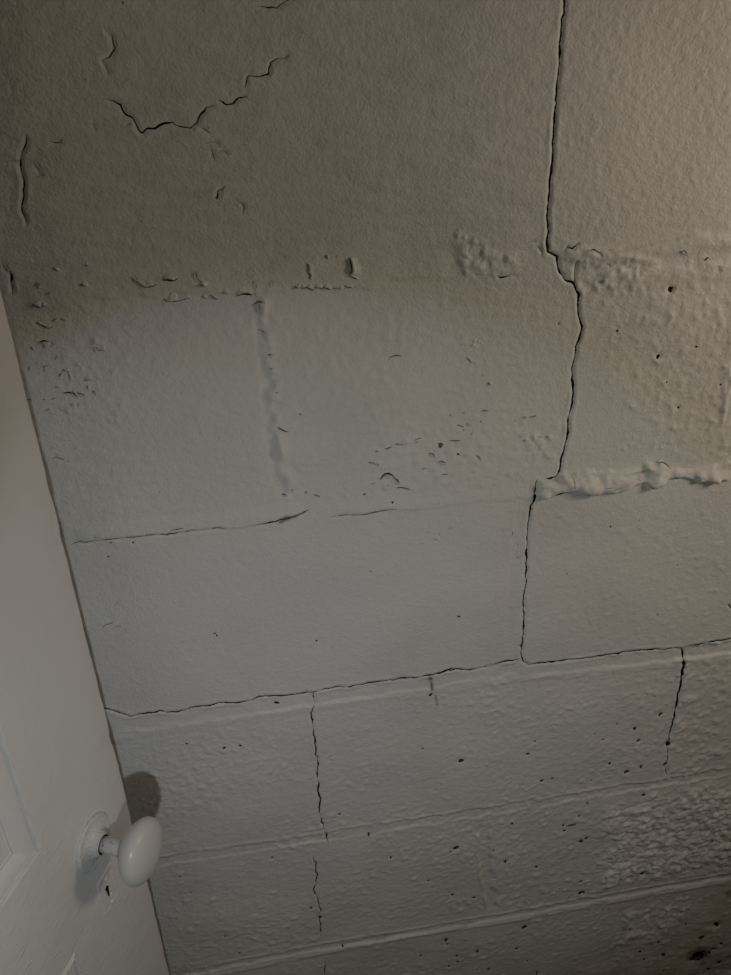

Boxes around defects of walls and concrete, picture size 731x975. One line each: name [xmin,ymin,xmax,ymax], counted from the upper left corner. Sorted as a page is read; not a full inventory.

crack [5,138,61,225]
crack [104,0,731,843]
crack [70,527,225,546]
crack [313,857,322,936]